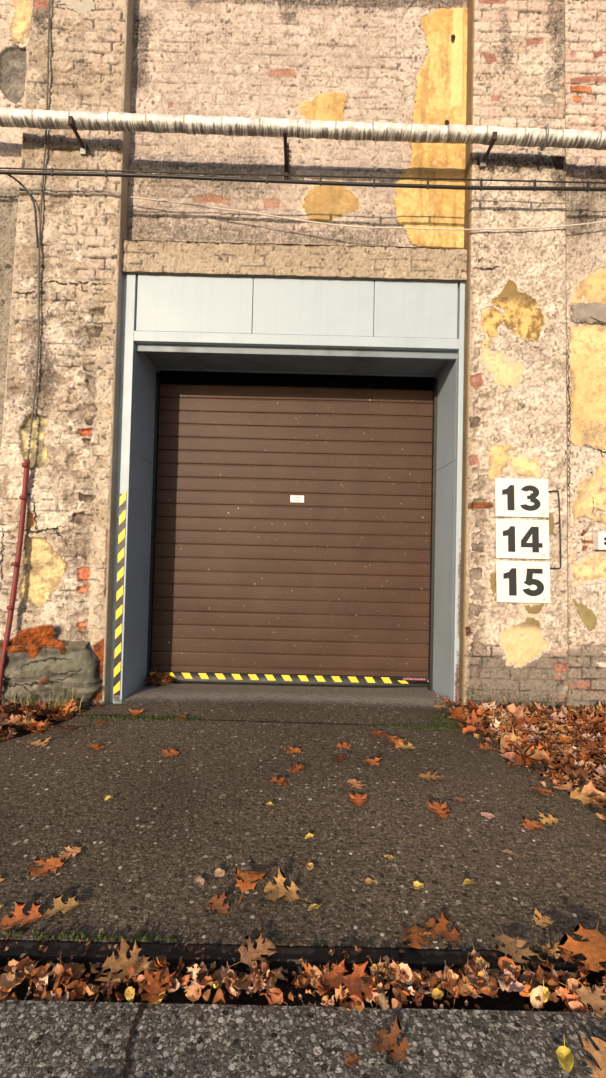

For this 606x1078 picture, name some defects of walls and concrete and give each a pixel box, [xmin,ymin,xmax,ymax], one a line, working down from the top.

spalling [0,0,48,104]
peeling [294,90,348,121]
peeling [412,6,468,125]
peeling [296,179,362,227]
peeling [394,143,466,249]
peeling [471,278,547,389]
spalling [79,362,97,446]
spalling [70,493,96,524]
peeling [546,324,606,631]
spalling [18,512,90,608]
peeling [469,567,498,605]
peeling [496,603,550,669]